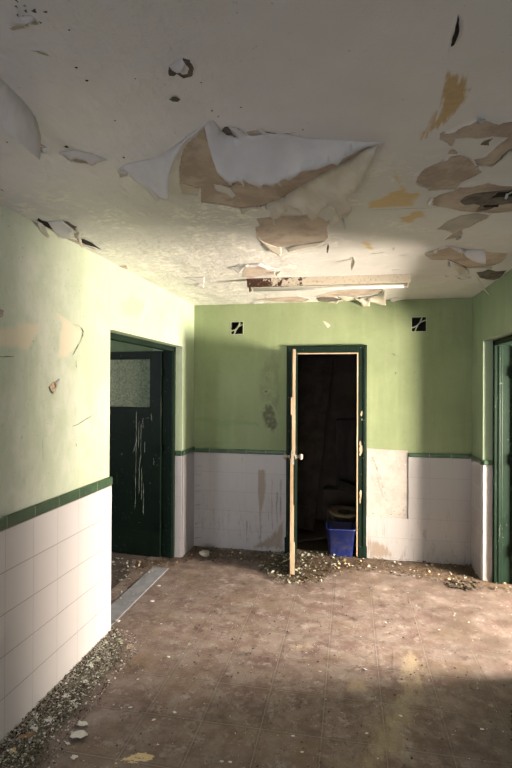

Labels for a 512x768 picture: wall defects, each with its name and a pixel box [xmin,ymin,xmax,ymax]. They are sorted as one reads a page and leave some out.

peeling [0,78,50,160]
peeling [37,218,101,250]
peeling [59,146,107,166]
peeling [167,55,198,79]
peeling [117,110,383,256]
leakage [413,63,480,144]
peeling [415,118,512,296]
peeling [53,308,84,368]